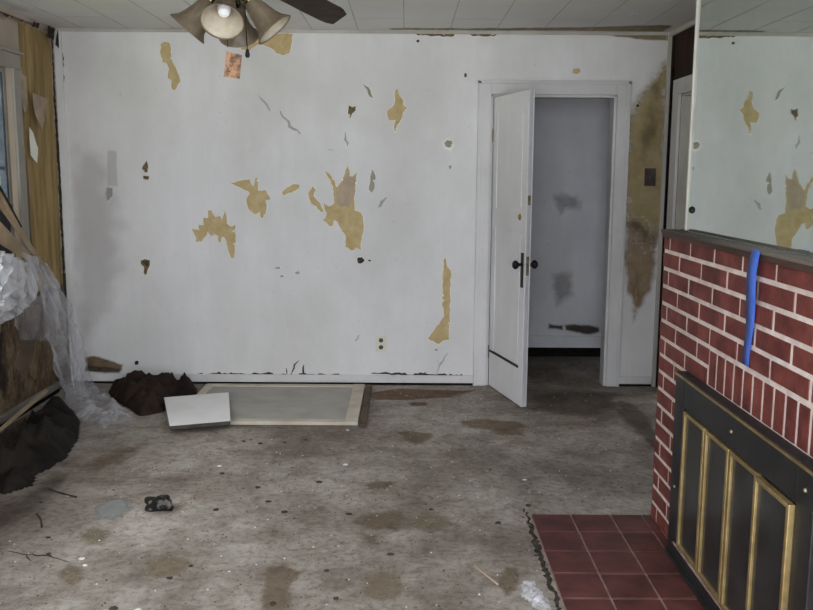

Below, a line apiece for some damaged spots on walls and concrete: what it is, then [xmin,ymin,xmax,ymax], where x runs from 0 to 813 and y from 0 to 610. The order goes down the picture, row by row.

peeling [159,41,181,91]
peeling [386,88,408,133]
peeling [191,209,237,259]
peeling [229,177,271,219]
peeling [281,164,372,265]
peeling [368,168,377,193]
peeling [428,255,452,351]